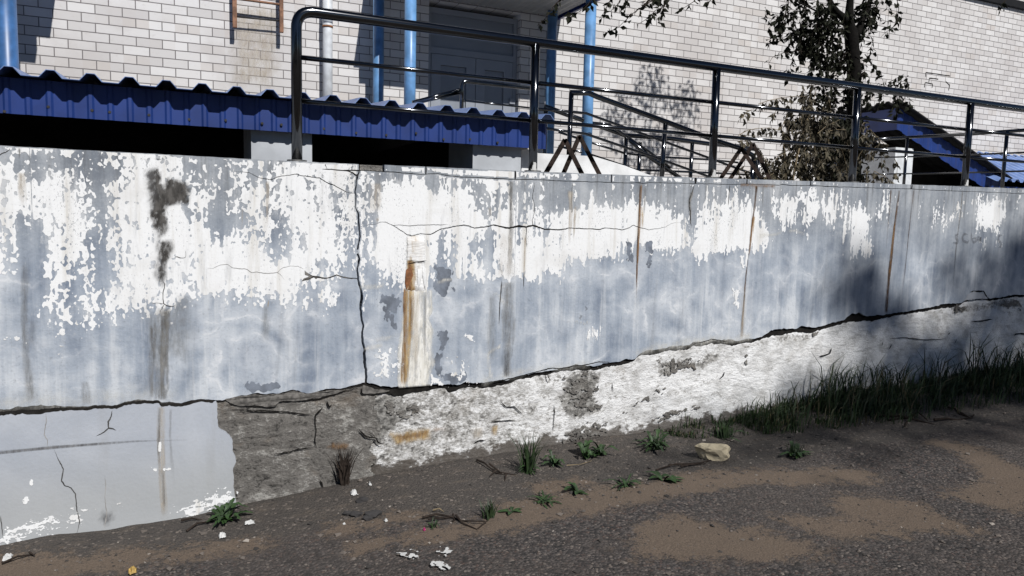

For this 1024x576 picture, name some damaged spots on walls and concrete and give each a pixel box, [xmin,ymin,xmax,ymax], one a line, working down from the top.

mould [148,169,189,279]
peeling [0,147,899,355]
crack [249,164,1022,245]
rust [885,192,899,312]
peeling [918,188,1021,251]
spalling [174,347,421,517]
rust [398,289,433,387]
peeling [431,330,478,386]
crack [0,255,1024,528]
peeling [562,367,608,443]
peeling [623,357,700,413]
peeling [656,405,701,422]